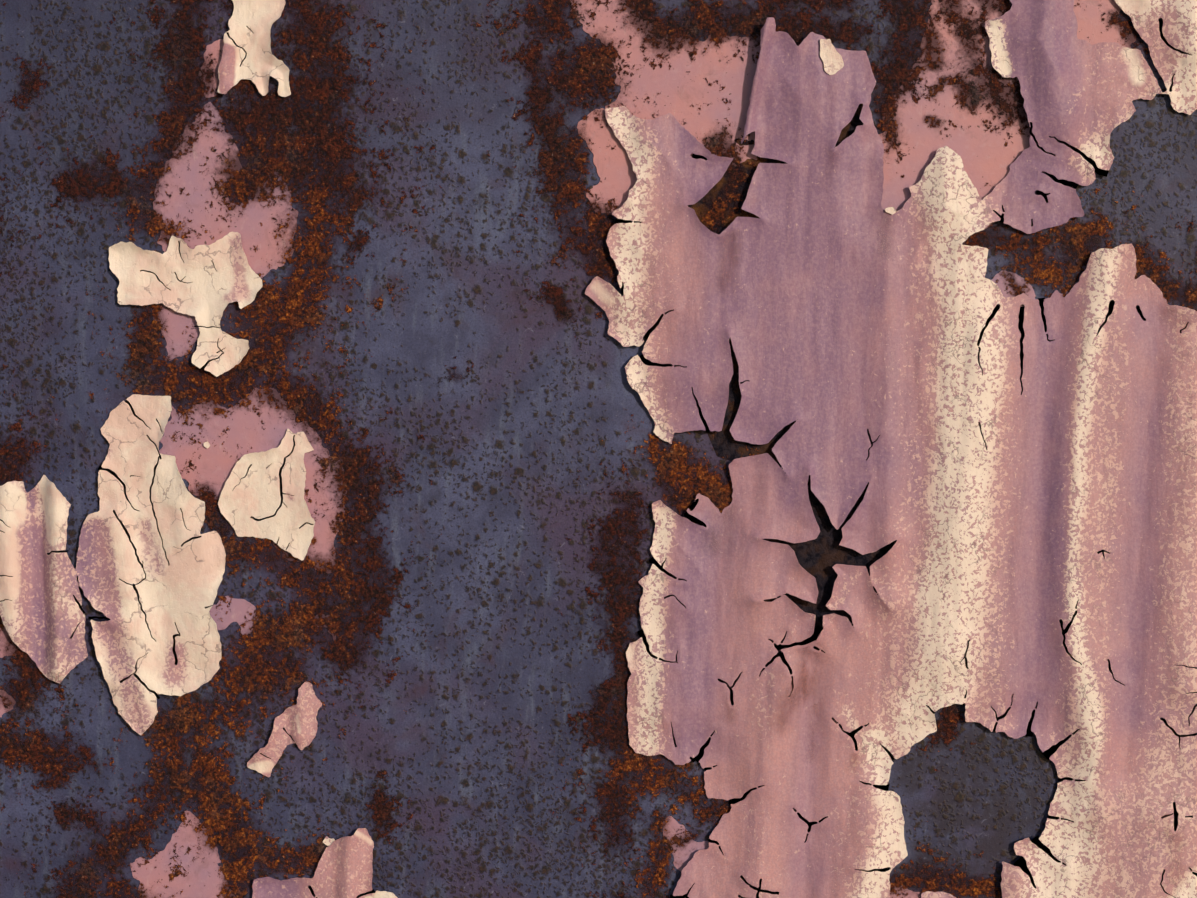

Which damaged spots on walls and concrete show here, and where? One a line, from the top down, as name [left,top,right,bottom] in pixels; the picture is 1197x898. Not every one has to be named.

corrosion [470,0,1030,343]
peeling [933,0,1197,338]
corrosion [963,183,1197,311]
peeling [0,0,315,898]
corrosion [0,0,444,898]
peeling [247,0,758,898]
corrosion [550,410,759,898]
crack [638,309,897,704]
crack [831,717,895,791]
peeling [868,684,1083,898]
crack [926,639,1086,782]
crack [1014,815,1074,888]